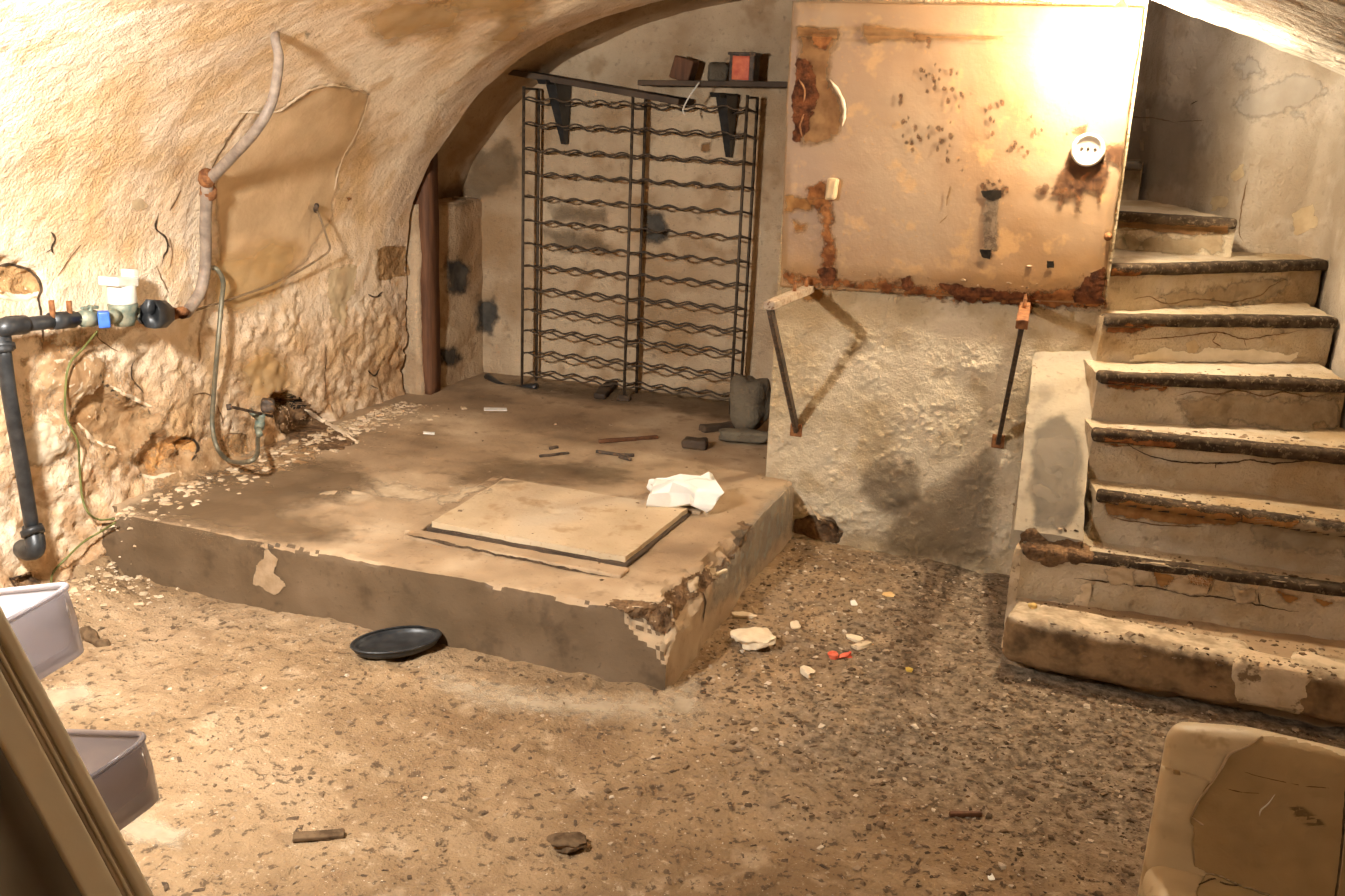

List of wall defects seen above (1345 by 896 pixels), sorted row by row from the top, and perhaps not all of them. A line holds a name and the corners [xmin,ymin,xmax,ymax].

rust [863,24,1004,44]
rust [791,26,846,144]
peeling [216,84,370,287]
rust [1036,142,1124,211]
spalling [0,263,42,301]
leakage [445,260,469,294]
leakage [477,300,499,334]
leakage [643,211,668,243]
rust [783,181,1142,314]
crack [1136,279,1303,347]
spalling [605,521,753,633]
crack [1074,578,1298,612]